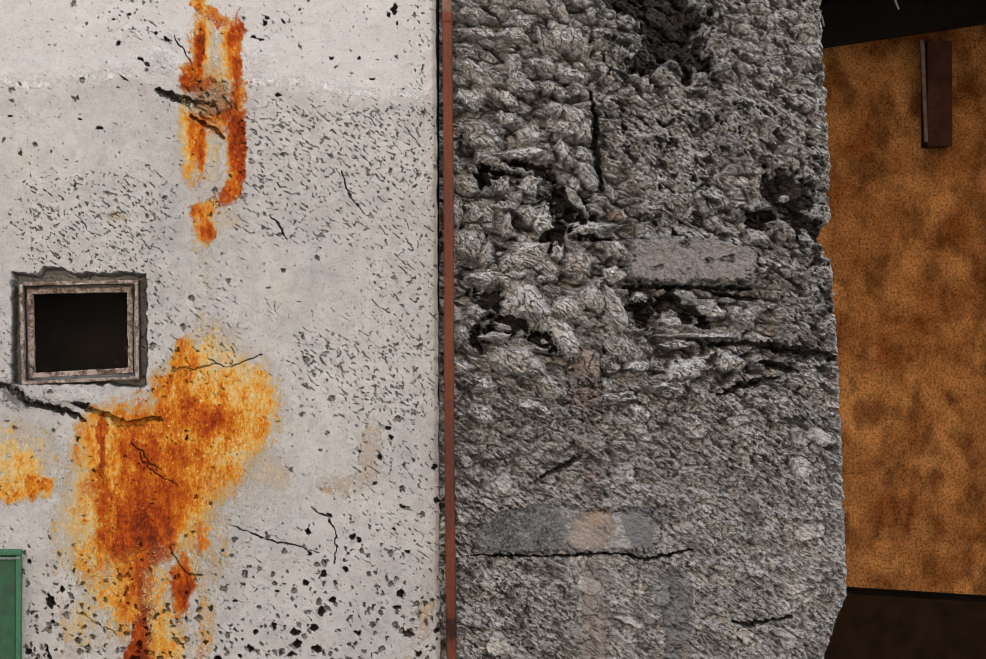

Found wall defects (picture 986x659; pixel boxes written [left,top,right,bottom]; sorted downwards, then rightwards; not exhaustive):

crack [154,87,225,139]
corrosion [0,0,301,659]
crack [0,383,151,427]
crack [232,506,338,564]